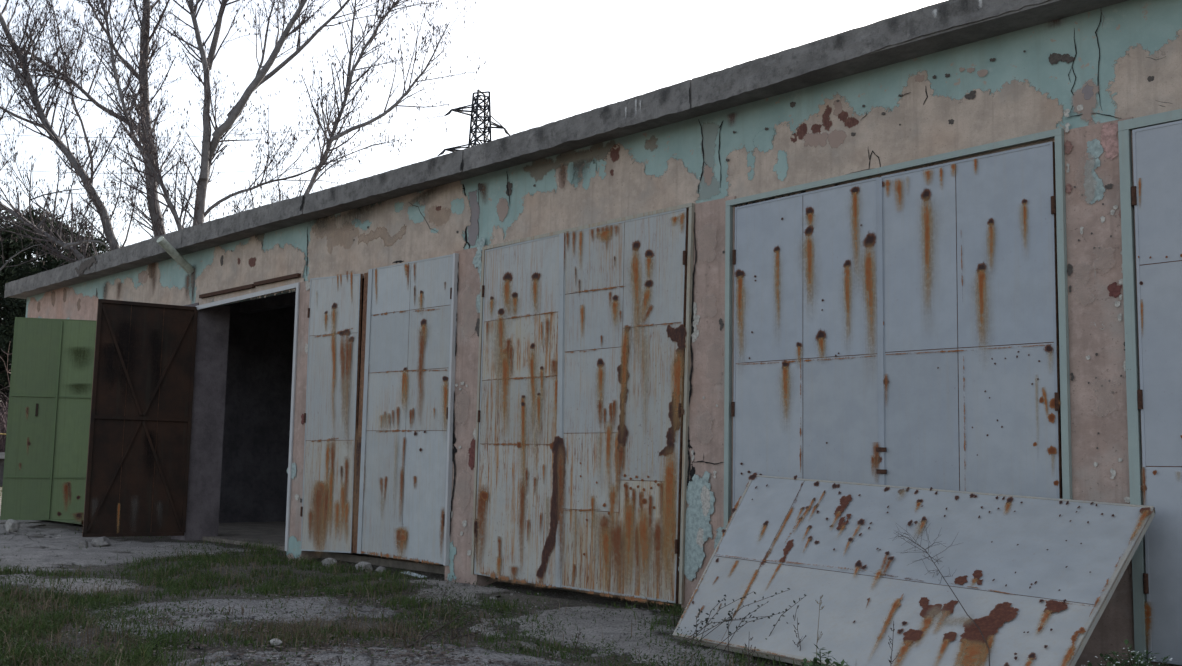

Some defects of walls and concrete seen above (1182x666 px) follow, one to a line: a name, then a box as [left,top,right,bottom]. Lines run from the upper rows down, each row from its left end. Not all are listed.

crack [1068,12,1118,118]
peeling [27,29,1182,336]
crack [687,88,723,484]
corrosion [843,186,884,330]
corrosion [977,218,994,331]
corrosion [308,263,448,543]
corrosion [482,225,687,605]
corrosion [747,330,871,406]
peeling [678,440,724,581]
corrosion [677,428,872,664]
corrosion [875,570,1019,666]
corrosion [1023,589,1069,633]